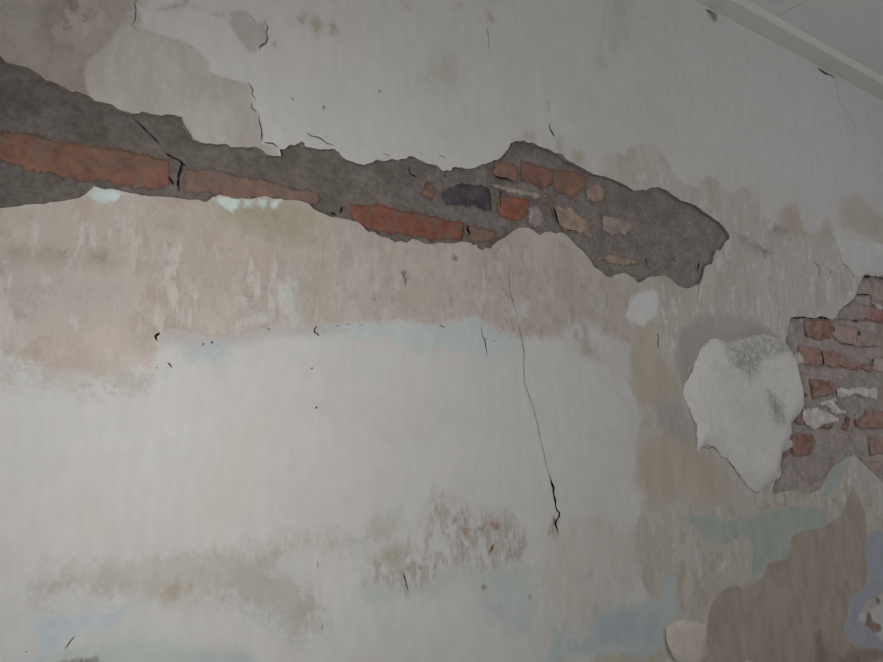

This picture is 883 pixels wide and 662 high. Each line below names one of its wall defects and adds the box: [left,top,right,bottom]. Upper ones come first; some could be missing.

damp [48,0,132,58]
damp [0,232,159,410]
damp [226,307,353,350]
spalling [0,0,730,288]
crack [481,259,524,353]
crack [524,380,560,533]
peeling [627,319,738,519]
peeling [776,193,854,246]
spalling [772,275,883,495]
flaking render [666,485,868,662]